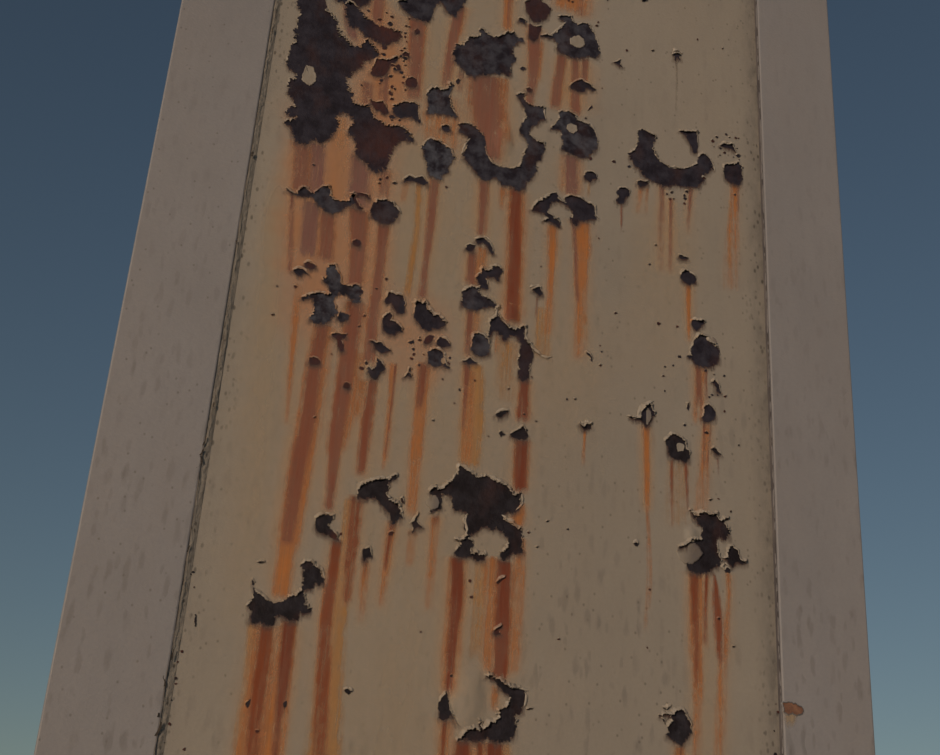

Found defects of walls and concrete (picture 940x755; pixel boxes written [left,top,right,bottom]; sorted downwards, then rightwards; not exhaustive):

corrosion [363,18,456,298]
peeling [283,0,603,192]
peeling [616,127,744,205]
peeling [359,236,552,382]
corrosion [478,180,525,322]
corrosion [272,117,389,755]
peeling [356,462,539,563]
corrosion [236,620,297,755]
peeling [245,558,325,629]
corrosion [443,541,525,707]
peeling [438,671,533,745]
corrosion [690,574,730,742]